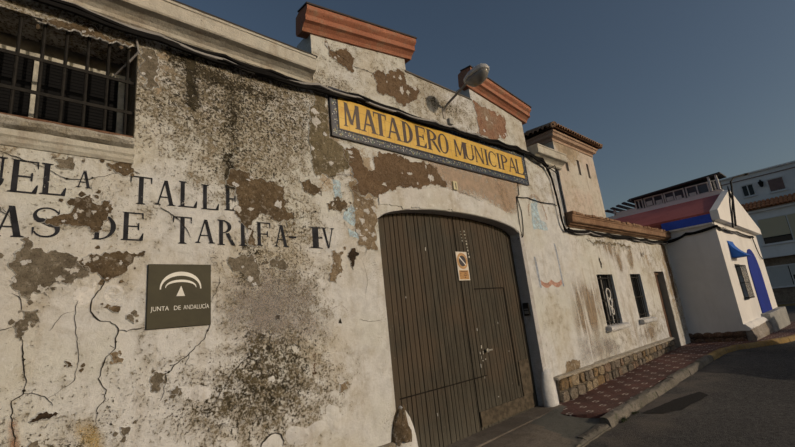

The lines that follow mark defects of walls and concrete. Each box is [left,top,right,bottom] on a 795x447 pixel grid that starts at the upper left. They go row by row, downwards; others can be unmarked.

mould [152,43,281,191]
peeling [325,41,354,74]
peeling [371,66,420,107]
peeling [472,100,508,140]
peeling [41,190,115,234]
peeling [225,165,295,287]
peeling [299,91,448,284]
peeling [0,236,146,341]
crack [2,276,145,446]
crack [162,326,210,397]
water stain [156,273,317,443]